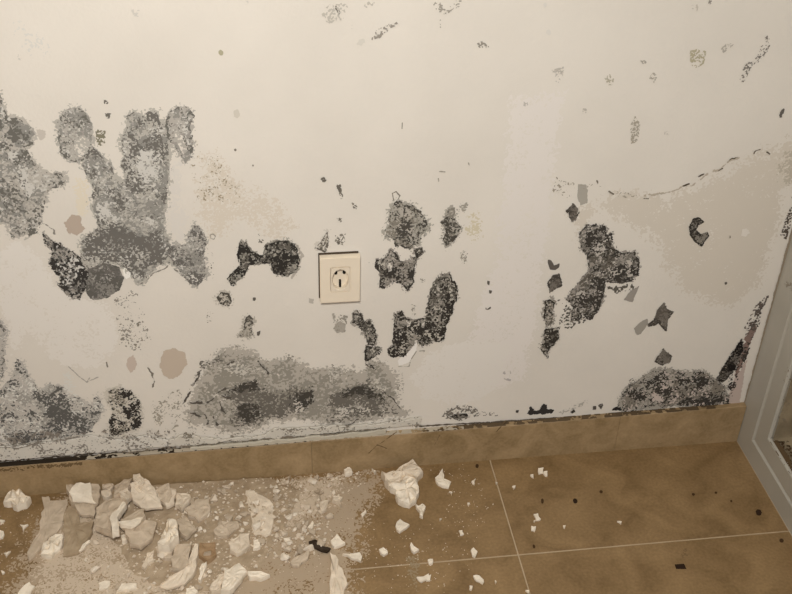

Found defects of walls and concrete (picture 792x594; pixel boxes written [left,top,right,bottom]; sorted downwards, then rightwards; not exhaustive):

water stain [0,89,304,373]
water stain [0,191,484,445]
water stain [516,402,584,415]
water stain [538,134,792,412]